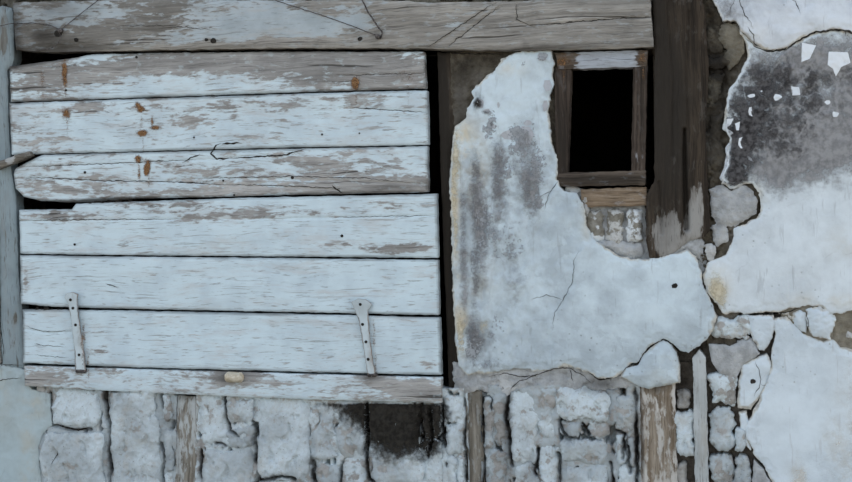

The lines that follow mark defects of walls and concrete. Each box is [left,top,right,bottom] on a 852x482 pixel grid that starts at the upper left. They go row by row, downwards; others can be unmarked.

crack [730,0,852,52]
corrosion [135,102,159,137]
corrosion [135,155,151,177]
flaking render [560,185,656,259]
flaking render [672,0,852,482]